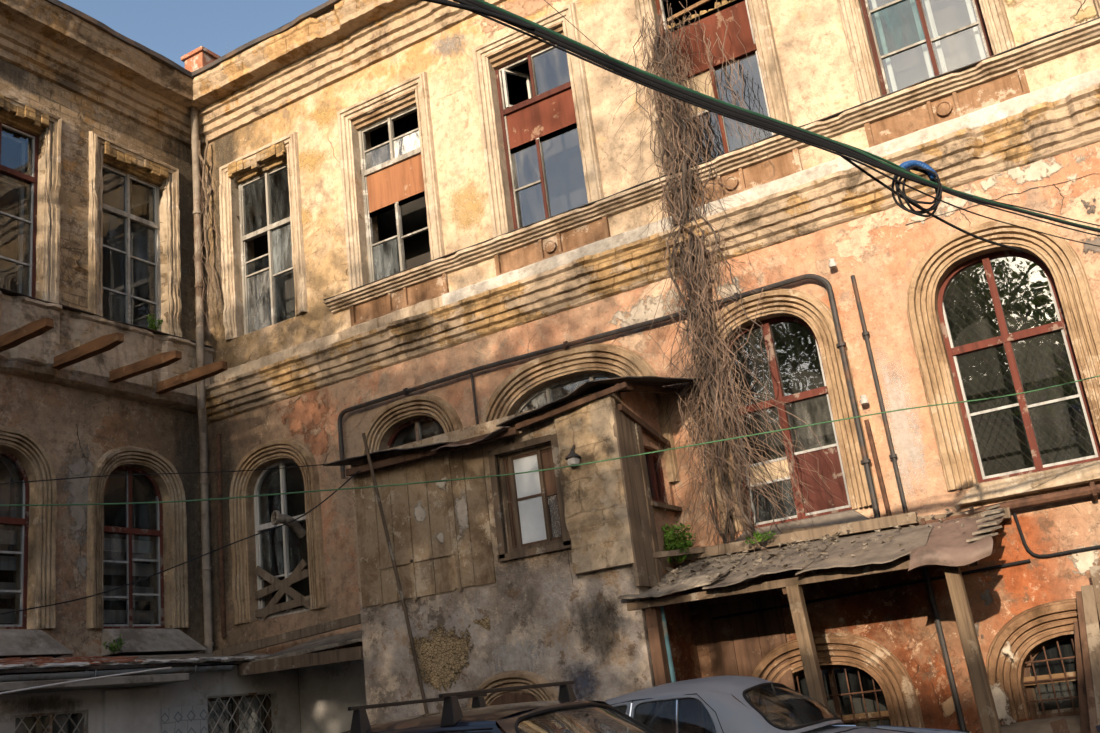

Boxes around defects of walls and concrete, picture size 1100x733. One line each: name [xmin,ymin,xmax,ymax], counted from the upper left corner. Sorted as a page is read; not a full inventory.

peeling [1081,198,1100,214]
peeling [1082,234,1100,255]
peeling [1068,539,1100,575]
spalling [407,617,491,692]
peeling [1001,641,1014,659]
peeling [990,682,1016,727]